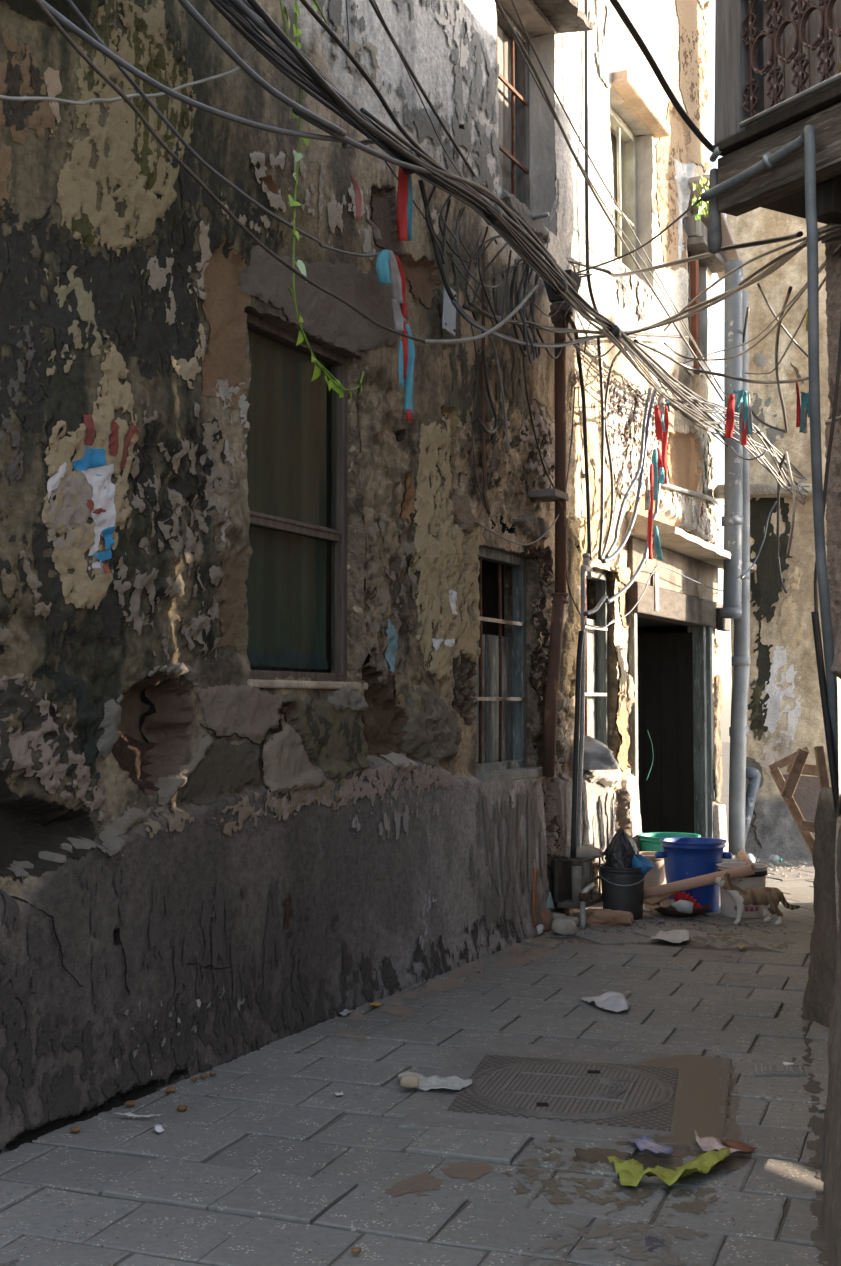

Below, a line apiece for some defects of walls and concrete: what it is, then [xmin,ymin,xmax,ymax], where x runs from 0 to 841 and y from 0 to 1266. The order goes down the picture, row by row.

peeling [0,0,197,257]
hole [680,24,708,121]
spalling [657,138,686,255]
peeling [141,220,212,329]
peeling [0,265,237,664]
peeling [359,368,660,726]
peeling [514,512,592,858]
spalling [0,673,107,883]
spalling [127,801,194,838]
spalling [213,762,456,836]
spalling [614,787,633,839]
peeling [755,732,796,776]